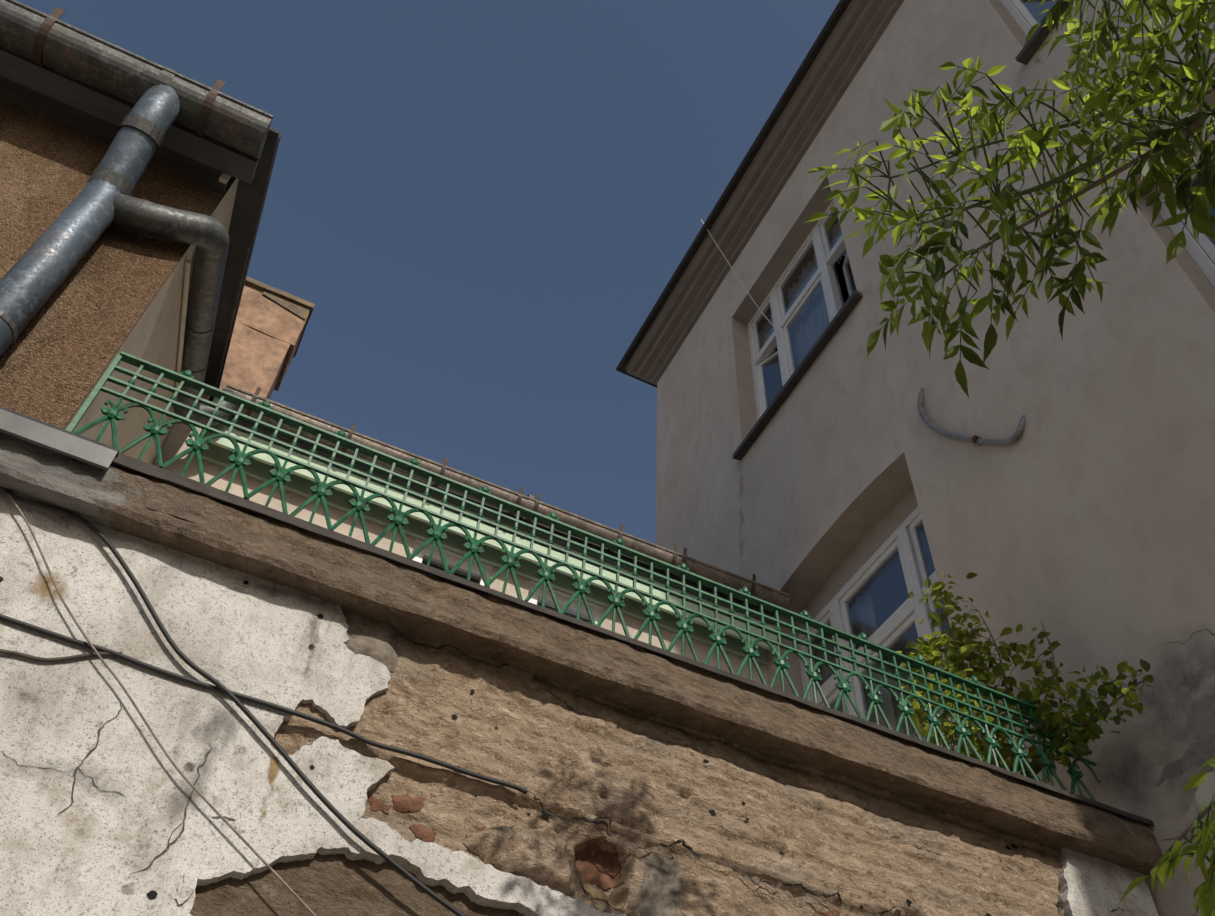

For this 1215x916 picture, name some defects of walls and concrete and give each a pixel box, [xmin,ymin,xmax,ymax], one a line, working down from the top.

crack [2,701,125,817]
crack [131,743,236,874]
spalling [271,631,1065,916]
peeling [1195,771,1215,808]
spalling [175,853,525,916]